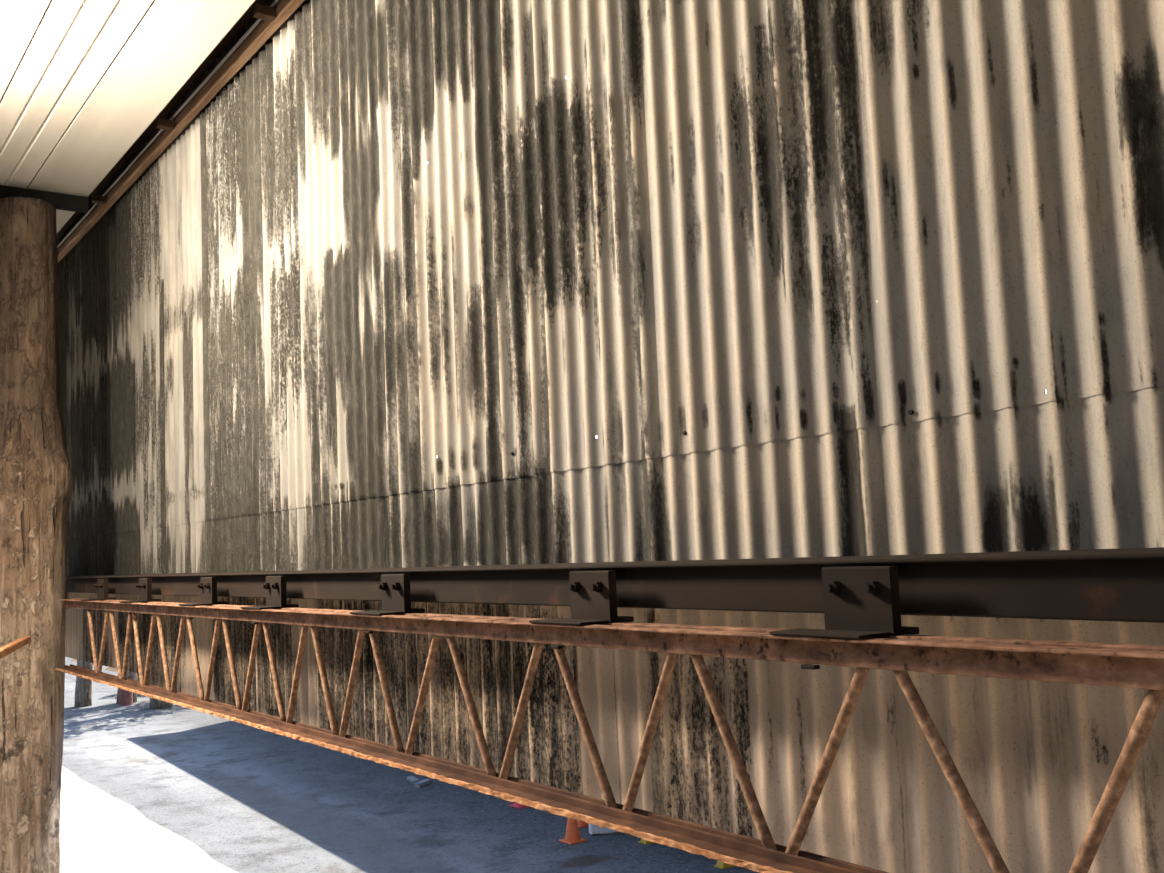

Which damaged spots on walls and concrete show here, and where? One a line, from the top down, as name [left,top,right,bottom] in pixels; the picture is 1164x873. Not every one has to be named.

damp [947,60,956,108]
damp [1031,63,1039,105]
damp [1115,40,1164,270]
damp [58,0,670,576]
damp [717,0,893,556]
damp [898,381,906,426]
damp [1098,314,1111,434]
damp [982,456,1080,552]
damp [319,599,382,611]
damp [212,619,300,720]
damp [316,627,583,794]
damp [647,652,752,837]